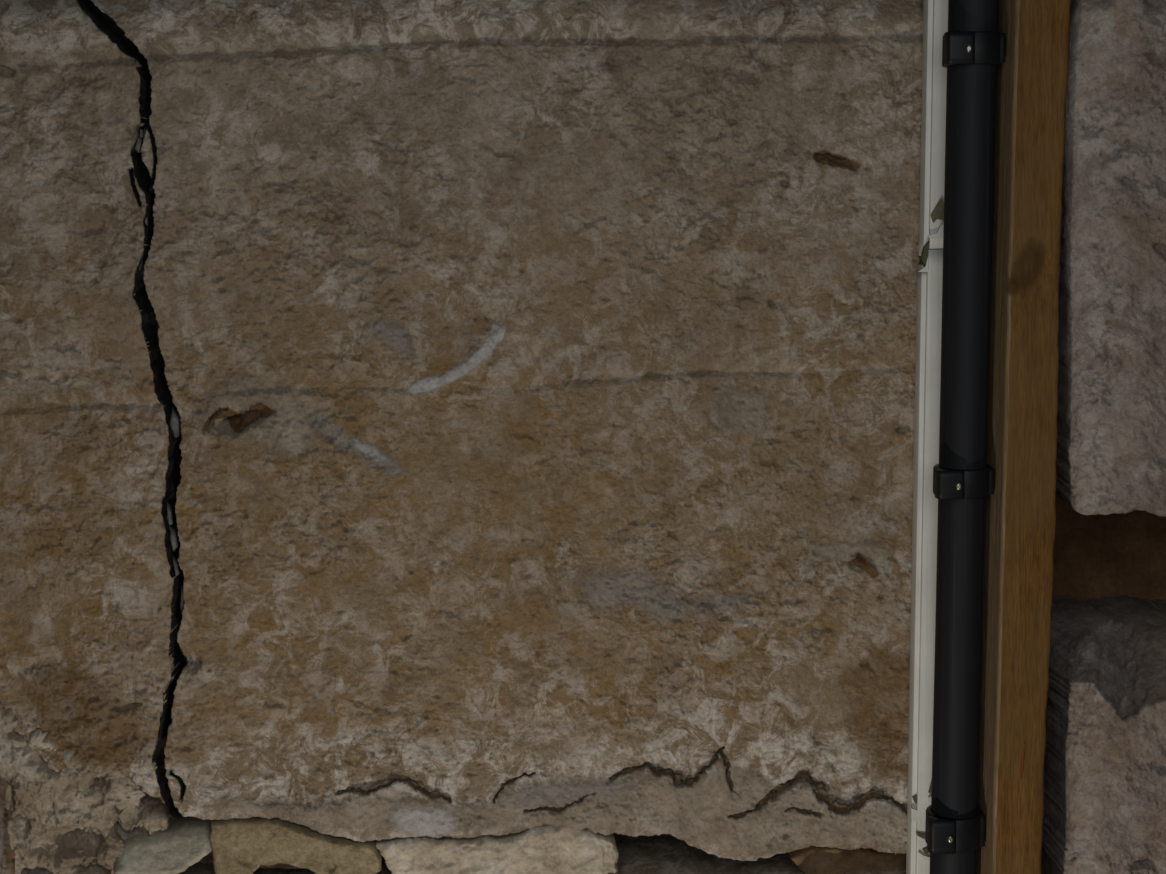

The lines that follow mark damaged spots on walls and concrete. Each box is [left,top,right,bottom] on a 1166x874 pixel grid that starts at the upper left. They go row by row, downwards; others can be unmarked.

crack [77,0,193,819]
crack [336,778,451,802]
crack [493,772,535,802]
spalling [216,758,931,862]
crack [524,746,907,818]